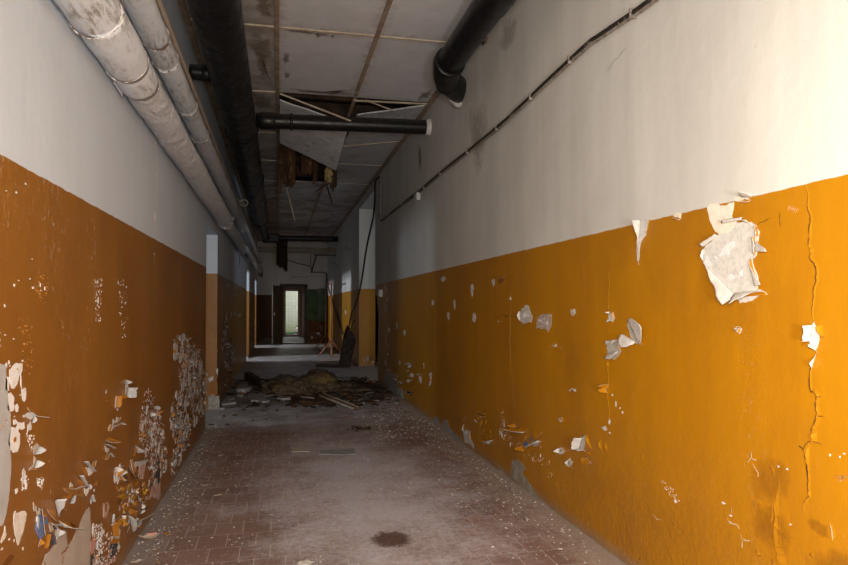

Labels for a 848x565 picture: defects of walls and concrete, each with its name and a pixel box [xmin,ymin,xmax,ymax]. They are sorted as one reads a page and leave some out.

peeling [631,218,650,265]
peeling [698,191,769,305]
peeling [517,305,552,332]
peeling [605,318,642,360]
crack [799,186,826,512]
peeling [0,334,220,565]
spalling [433,409,554,511]
peeling [553,435,608,469]
water stain [372,532,408,547]